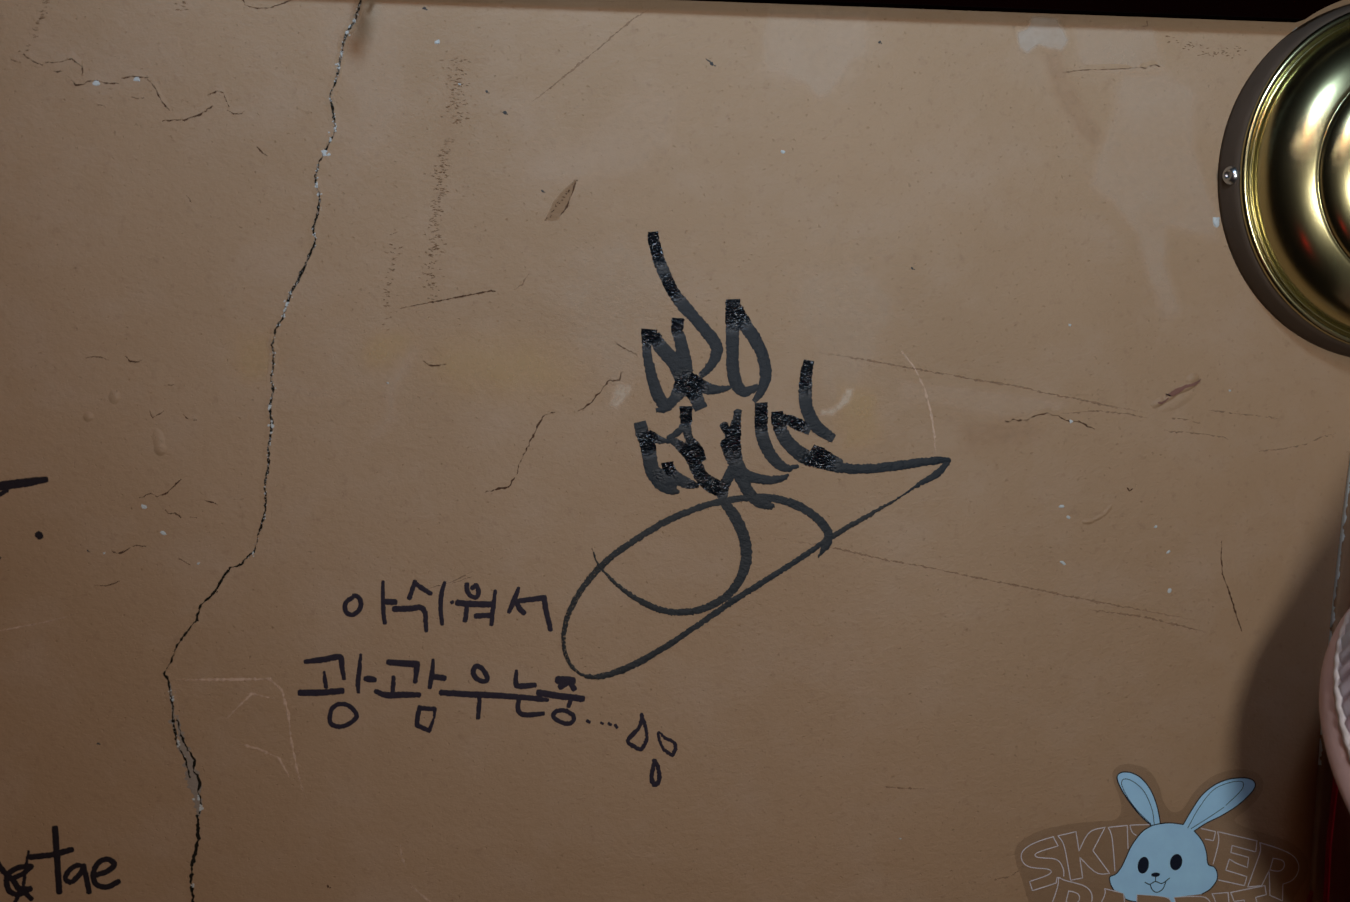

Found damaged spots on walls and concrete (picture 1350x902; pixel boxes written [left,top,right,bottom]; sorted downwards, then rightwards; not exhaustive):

crack [10,49,244,122]
crack [158,0,367,902]
crack [485,342,638,493]
hole [1151,373,1201,413]
crack [139,475,218,535]